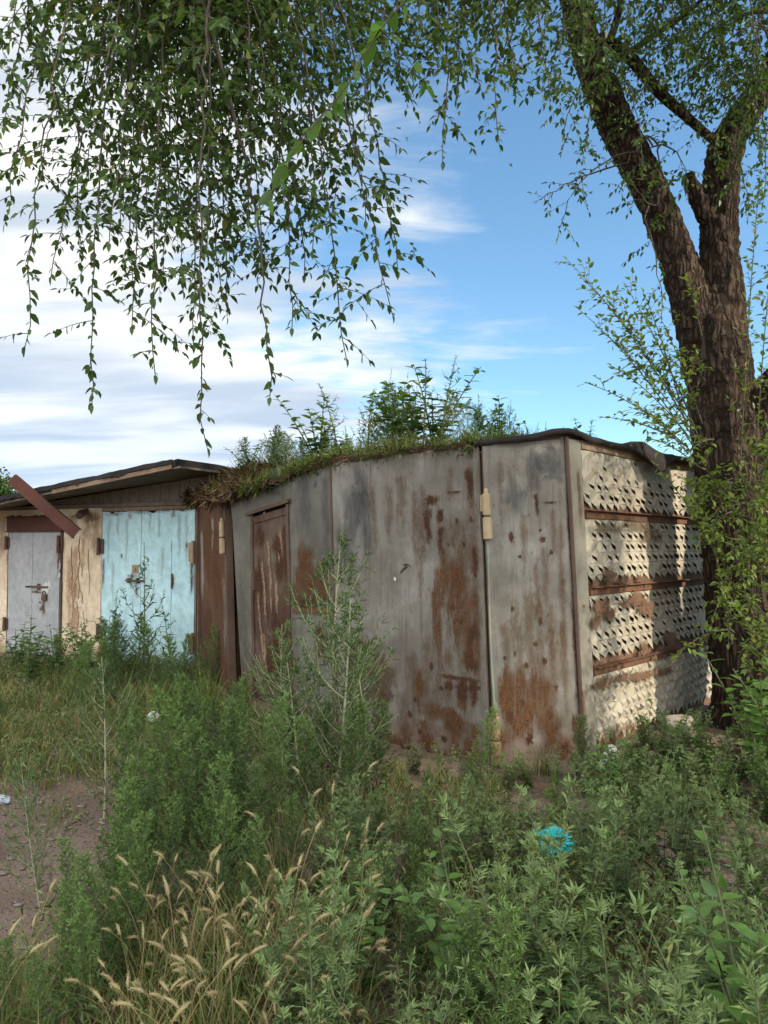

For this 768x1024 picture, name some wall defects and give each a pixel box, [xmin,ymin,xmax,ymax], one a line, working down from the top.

rust [190,519,225,652]
rust [264,611,286,690]
rust [253,525,332,609]
rust [376,468,491,762]
rust [498,566,678,761]